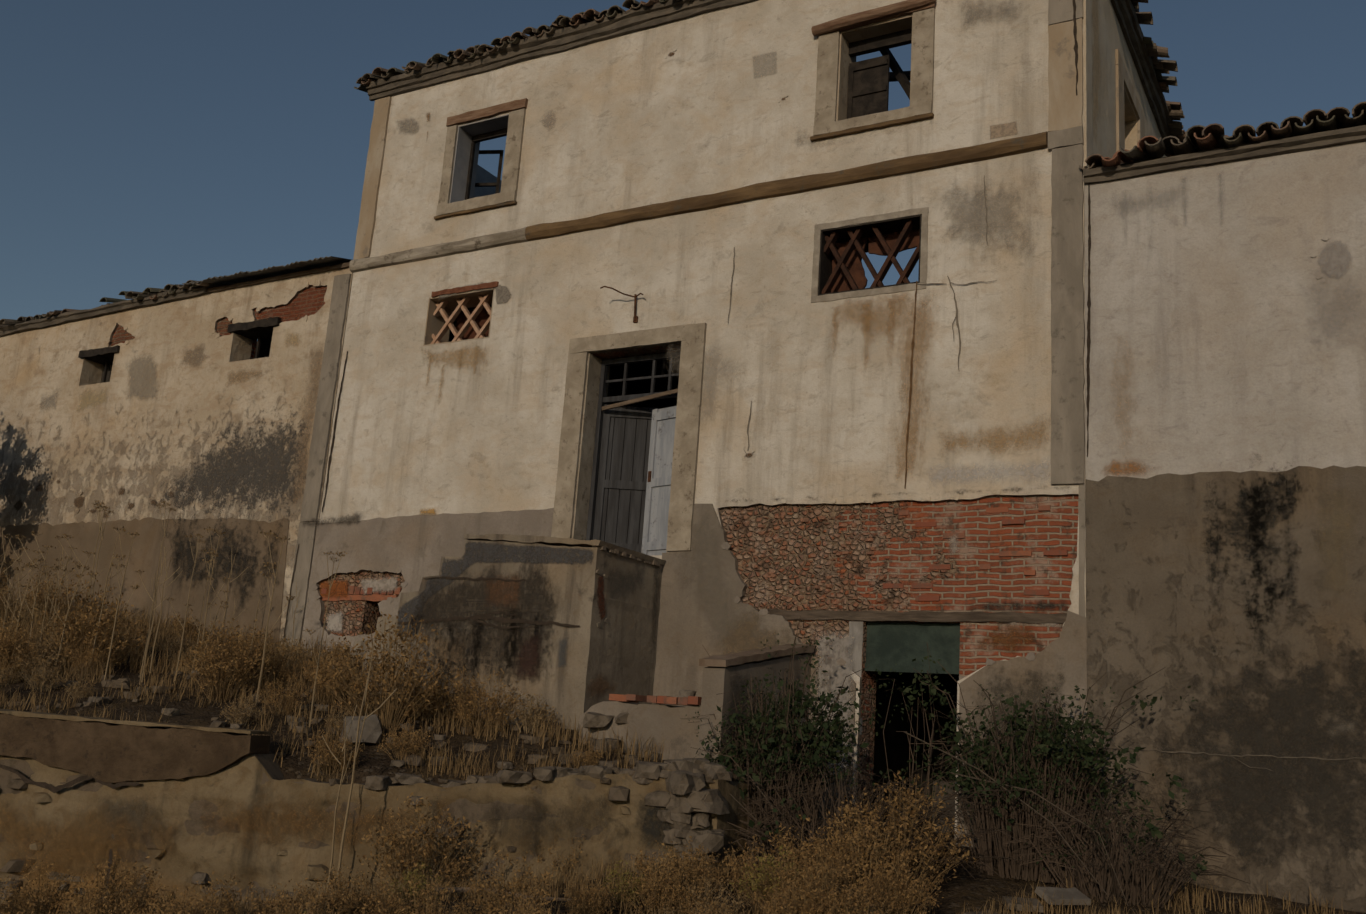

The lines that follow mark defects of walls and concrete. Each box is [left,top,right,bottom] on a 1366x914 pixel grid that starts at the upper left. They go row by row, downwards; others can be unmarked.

crack [1071,0,1079,95]
flaking render [256,281,326,322]
crack [904,276,996,489]
damp [160,407,359,606]
flaking render [313,568,408,631]
damp [414,567,566,680]
flaking render [818,635,852,773]
flaking render [784,493,965,605]
flaking render [979,550,1068,665]
damp [1163,475,1366,870]